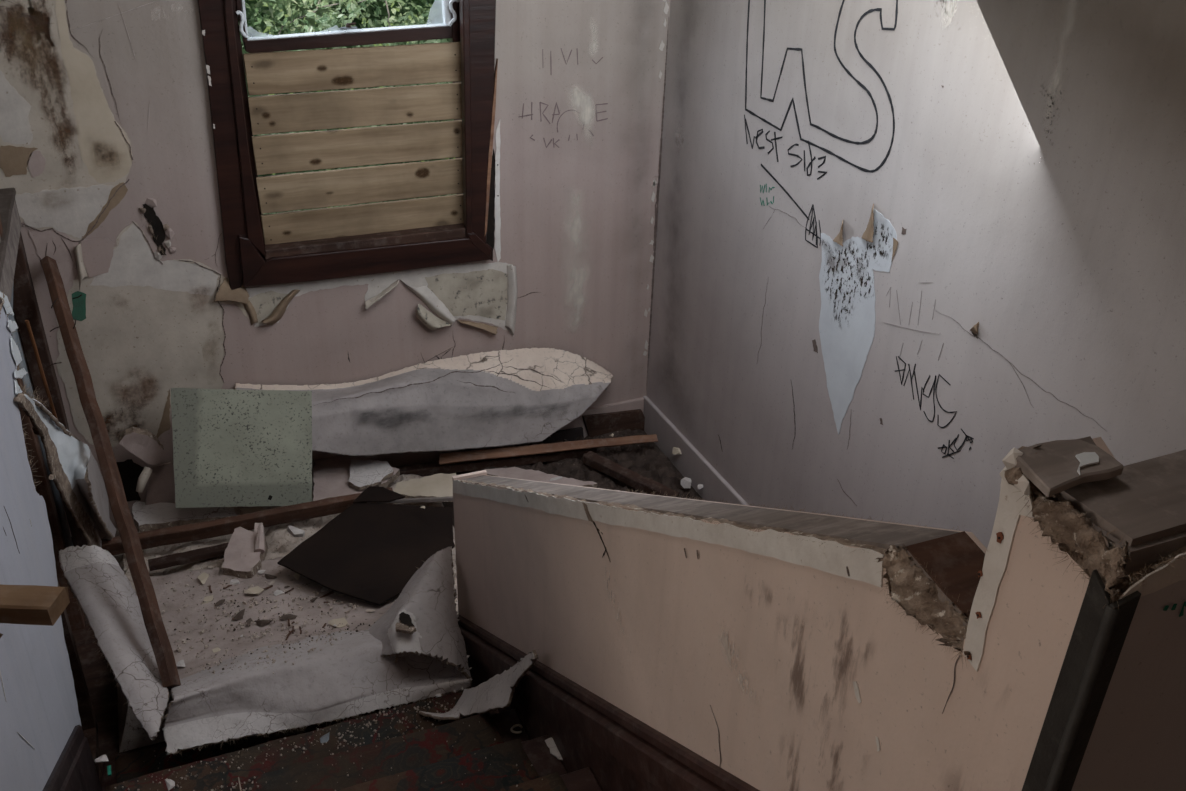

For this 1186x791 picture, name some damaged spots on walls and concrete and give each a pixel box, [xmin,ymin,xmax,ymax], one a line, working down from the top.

peeling [0,0,133,242]
peeling [246,120,517,337]
peeling [56,318,94,445]
peeling [67,198,226,447]
peeling [812,204,907,435]
spalling [116,459,144,502]
crack [582,502,610,561]
spalling [874,545,972,667]
spalling [999,444,1131,609]